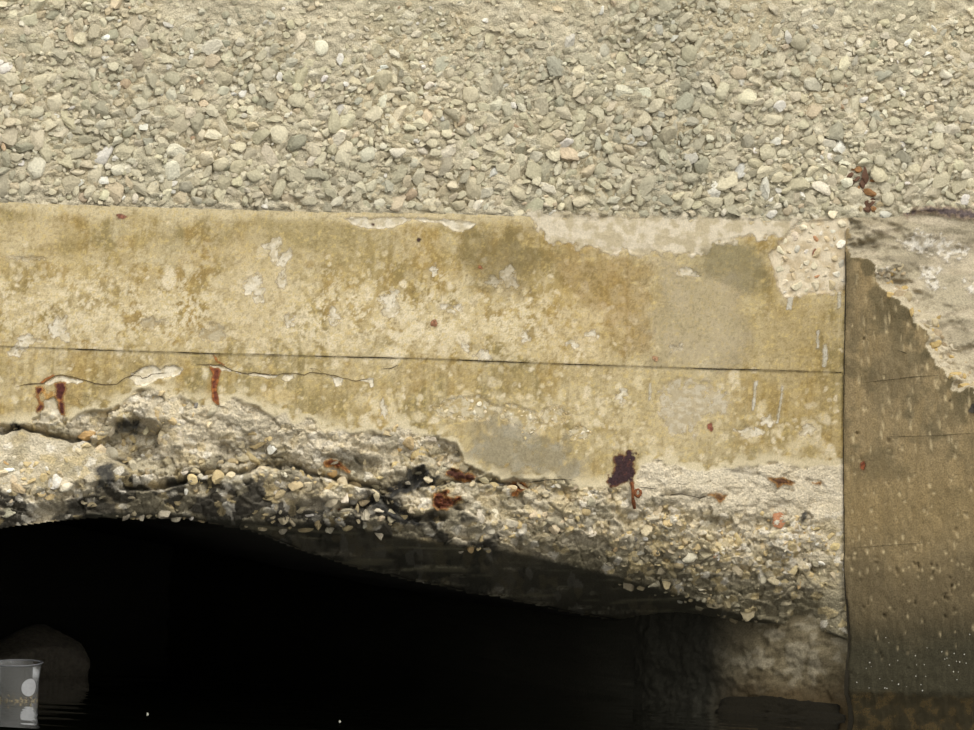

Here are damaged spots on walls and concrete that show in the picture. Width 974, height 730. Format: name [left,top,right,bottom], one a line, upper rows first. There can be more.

peeling [527,210,850,298]
corrosion [35,375,67,416]
crack [17,351,397,408]
corrosion [210,355,224,405]
crack [462,357,527,365]
crack [692,365,797,373]
corrosion [606,450,637,488]
spalling [0,365,848,641]